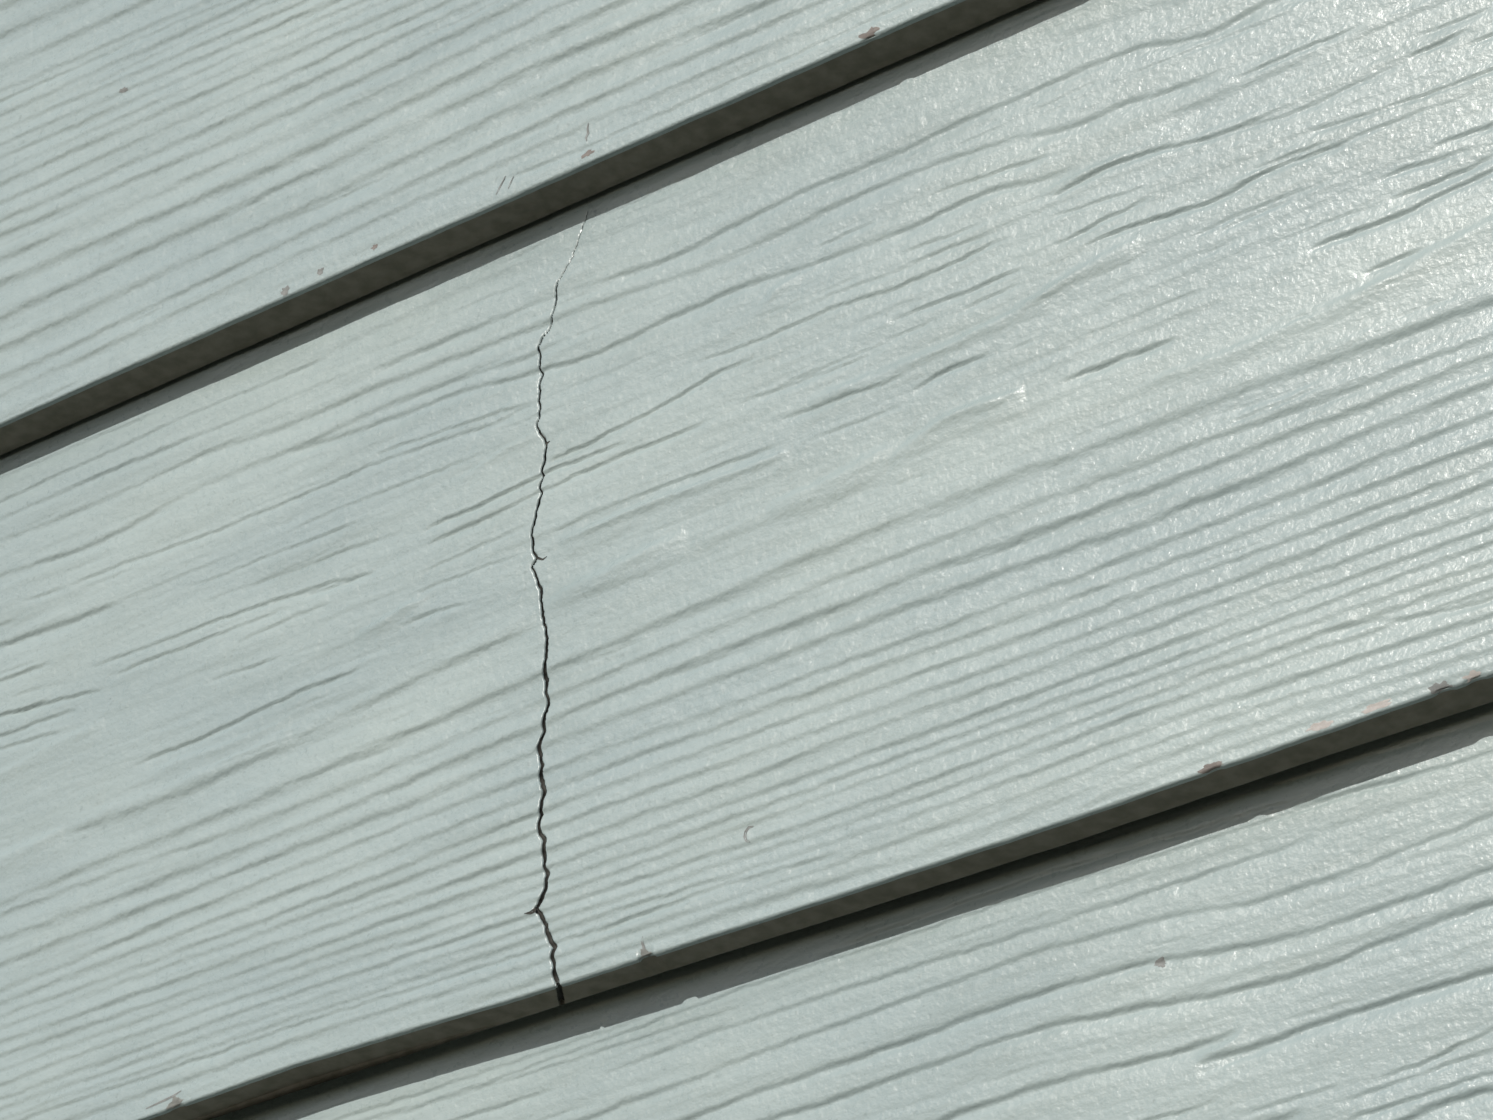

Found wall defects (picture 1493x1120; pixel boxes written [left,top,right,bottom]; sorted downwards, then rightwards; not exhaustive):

crack [524,213,588,1001]